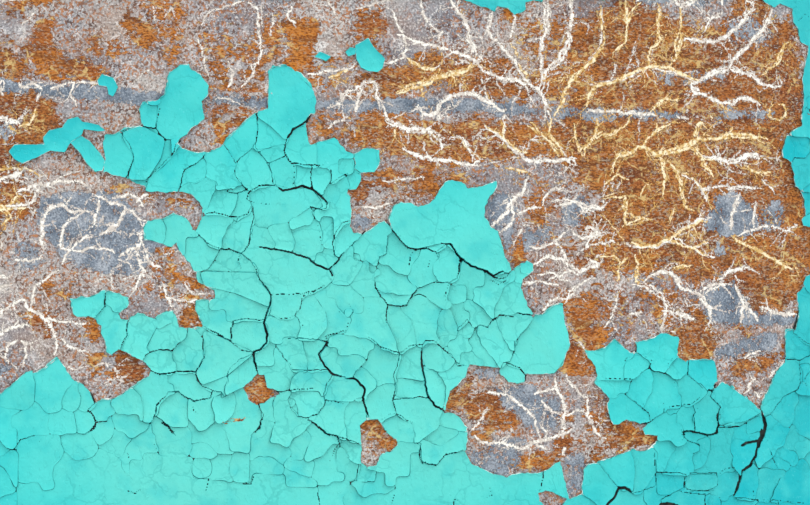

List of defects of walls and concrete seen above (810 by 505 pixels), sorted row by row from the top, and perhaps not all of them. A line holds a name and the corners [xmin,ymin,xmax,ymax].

rust [0,0,200,86]
peeling [635,0,742,55]
leakage [315,96,541,118]
peeling [392,79,578,131]
rust [0,88,63,250]
rust [72,316,147,388]
crack [143,113,365,433]
crack [276,330,368,456]
rust [192,0,810,472]
crack [603,351,807,505]
leakage [703,188,785,257]
leakage [703,271,797,360]